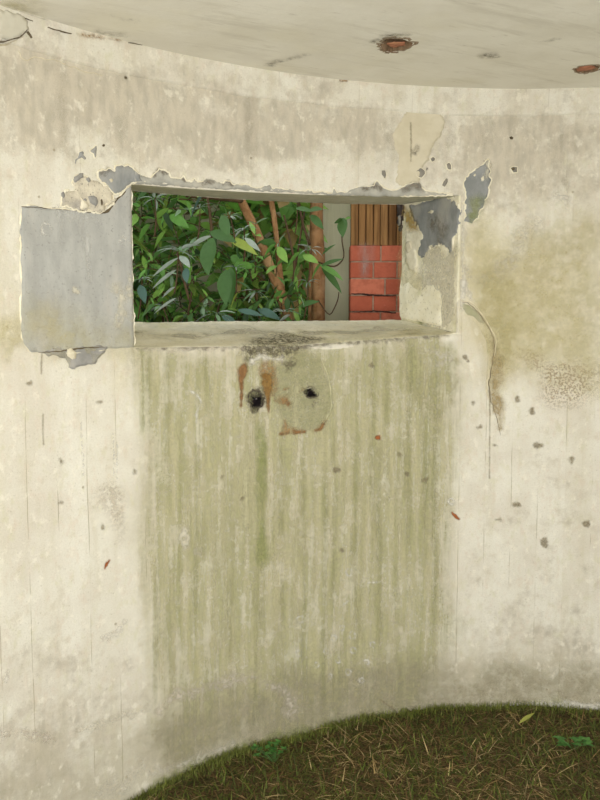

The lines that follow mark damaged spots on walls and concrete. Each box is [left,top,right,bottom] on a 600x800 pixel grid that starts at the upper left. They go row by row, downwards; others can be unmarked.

peeling [19,156,492,369]
corrosion [238,364,247,407]
corrosion [260,363,275,409]
crack [462,301,503,431]